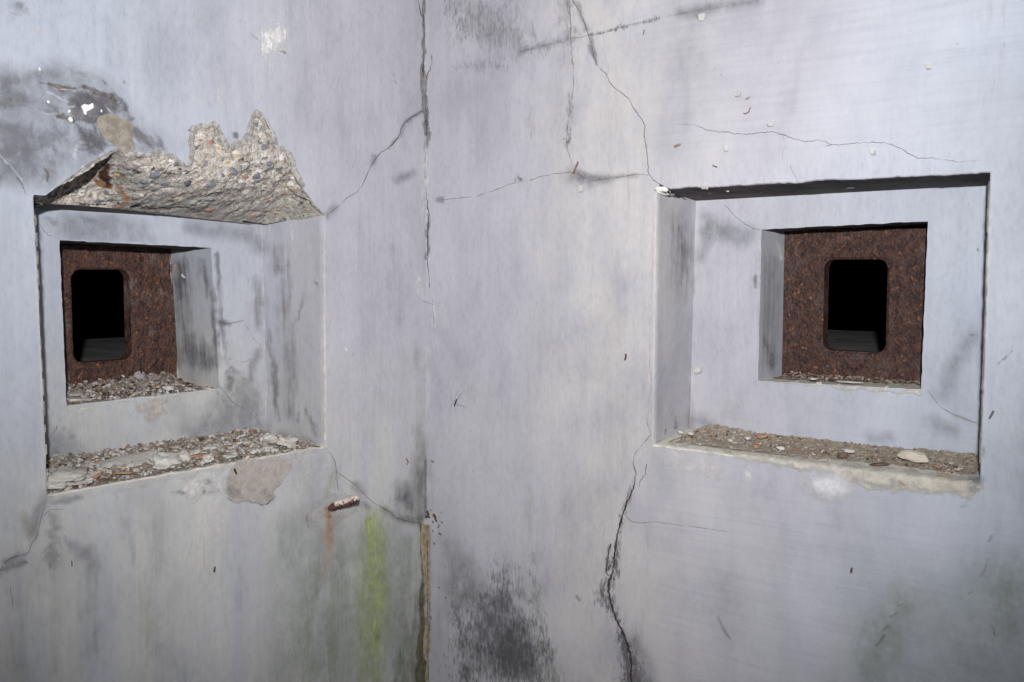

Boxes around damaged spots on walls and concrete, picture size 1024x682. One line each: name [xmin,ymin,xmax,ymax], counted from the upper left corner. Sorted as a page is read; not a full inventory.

leakage [0,71,127,182]
spalling [33,110,324,225]
crack [328,0,715,318]
peeling [180,456,292,504]
crack [325,448,418,523]
crack [594,423,729,682]
leakage [456,577,540,680]